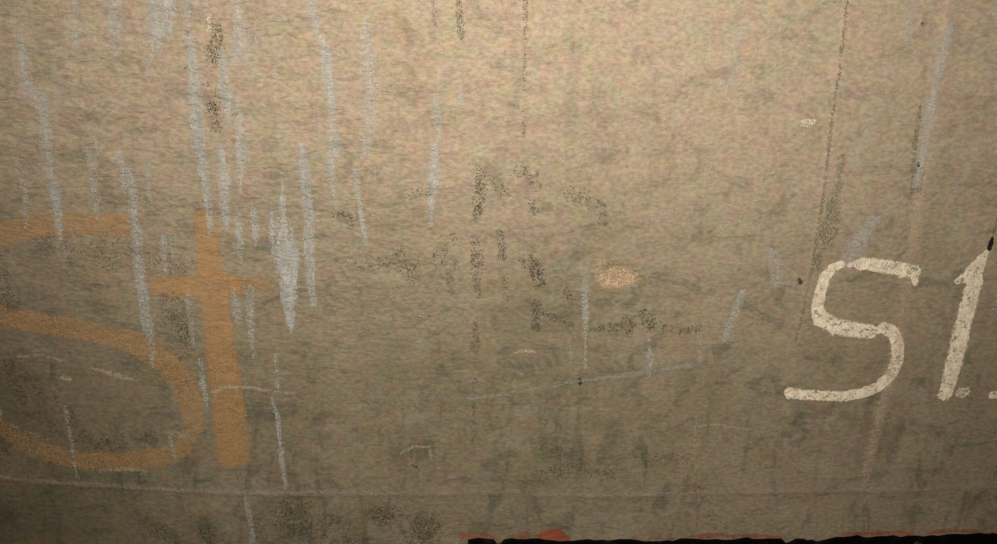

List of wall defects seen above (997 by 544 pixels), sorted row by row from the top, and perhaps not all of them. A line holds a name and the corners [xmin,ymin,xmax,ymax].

damp [0,357,177,479]
damp [14,27,208,409]
damp [142,0,317,333]
damp [230,285,255,359]
damp [307,0,460,297]
damp [472,164,542,223]
crack [794,1,849,340]